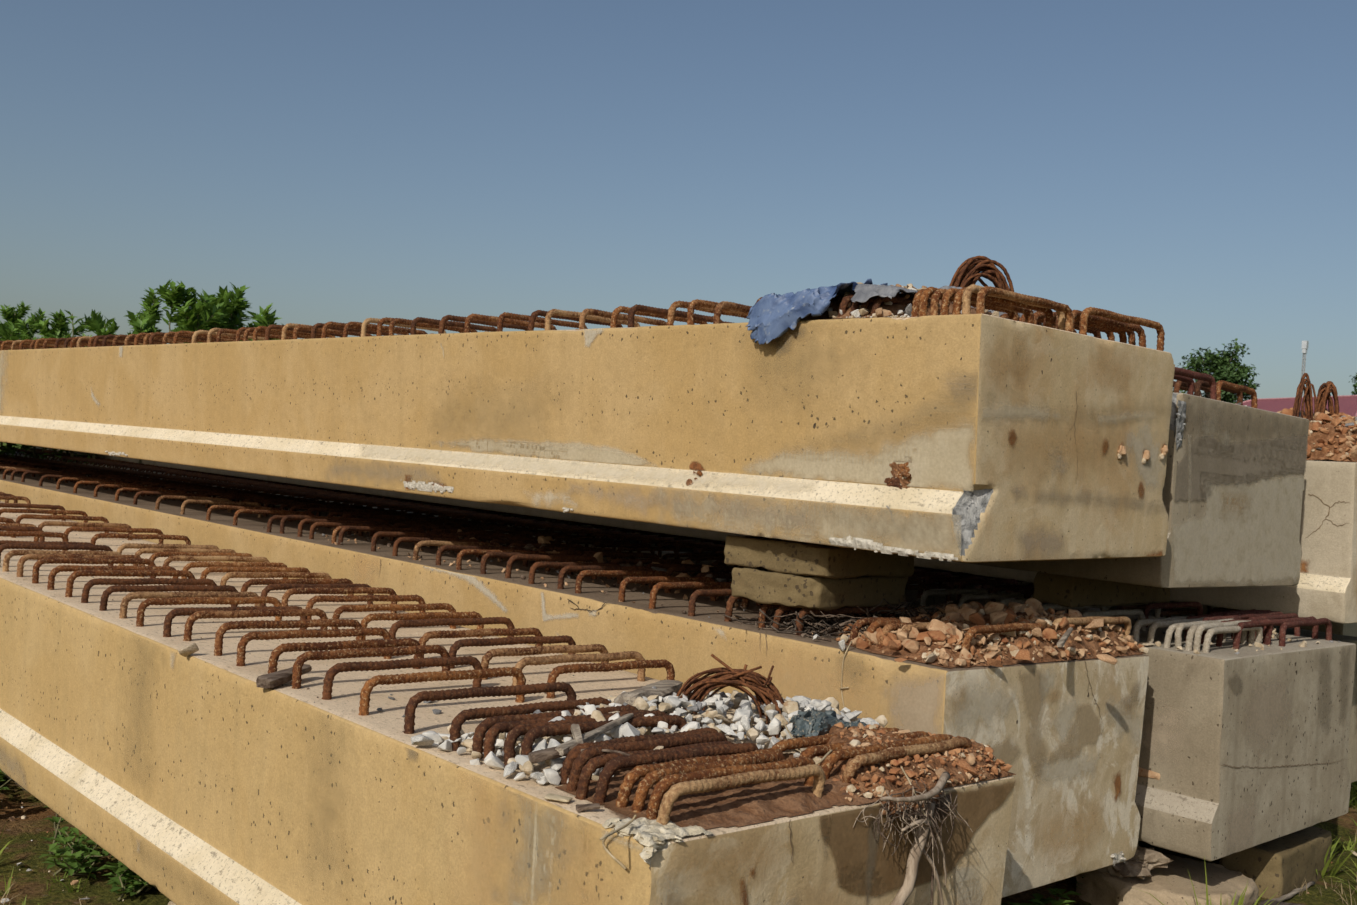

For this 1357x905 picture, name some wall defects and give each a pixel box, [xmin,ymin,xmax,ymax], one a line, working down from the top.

rust [689,461,705,481]
rust [884,456,912,489]
spalling [829,489,993,562]
crack [1309,494,1351,534]
crack [1221,759,1349,768]
spalling [604,817,713,867]